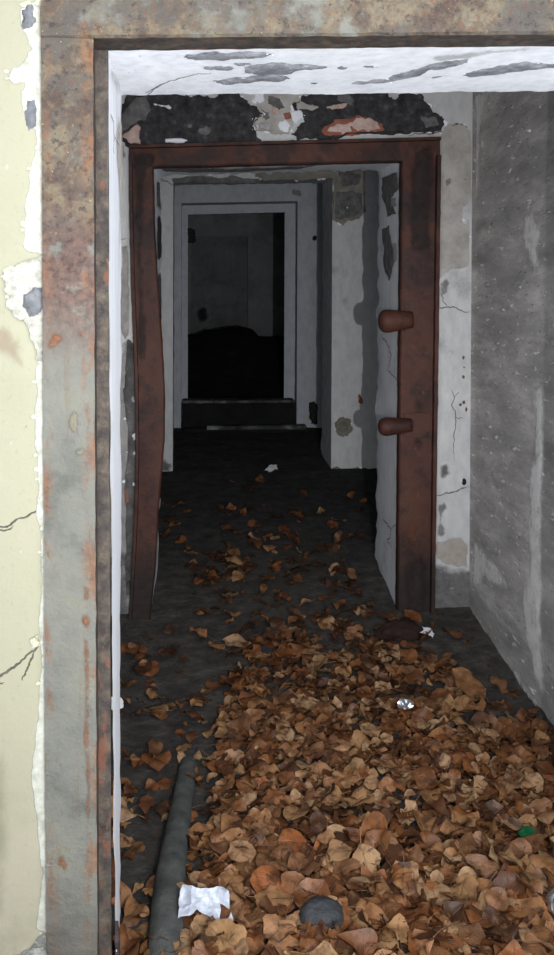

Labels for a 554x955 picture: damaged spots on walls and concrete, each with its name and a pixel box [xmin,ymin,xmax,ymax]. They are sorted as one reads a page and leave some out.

peeling [121,51,554,149]
crack [0,511,36,532]
peeling [1,0,47,955]
spalling [122,339,136,596]
crack [0,646,39,685]